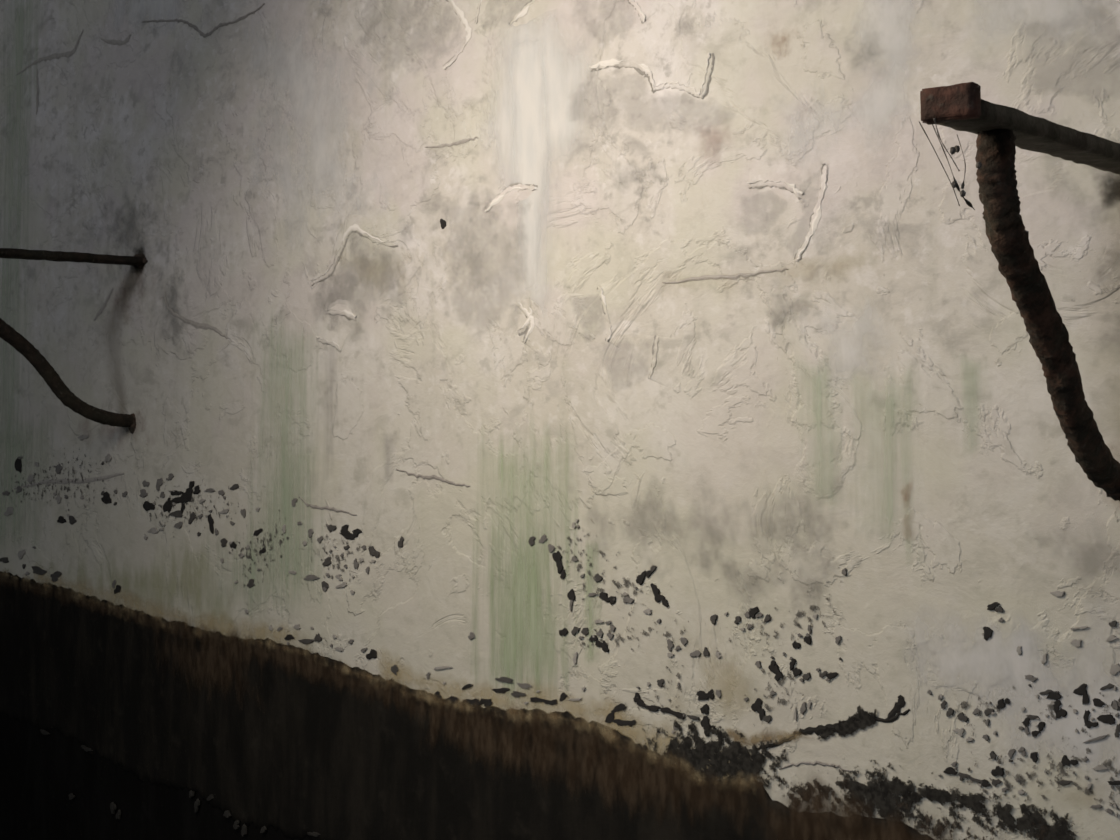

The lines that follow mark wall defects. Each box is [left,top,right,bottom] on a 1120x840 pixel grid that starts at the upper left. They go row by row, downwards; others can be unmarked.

crack [17,3,264,114]
flaking render [443,0,498,80]
flaking render [589,37,715,99]
flaking render [311,208,399,352]
damp [0,571,307,656]
damp [480,691,708,784]